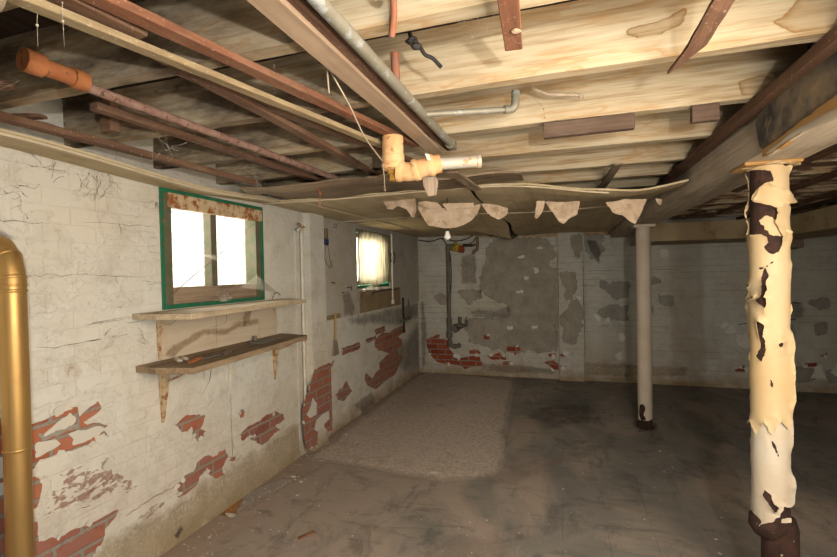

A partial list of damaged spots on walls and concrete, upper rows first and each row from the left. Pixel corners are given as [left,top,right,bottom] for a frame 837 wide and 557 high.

flaking render [426,237,630,372]
flaking render [341,326,403,389]
flaking render [795,352,837,383]
flaking render [175,414,206,441]
flaking render [237,411,285,445]
flaking render [302,360,352,449]
flaking render [32,402,118,557]
water stain [48,460,131,512]
flaking render [172,449,239,497]